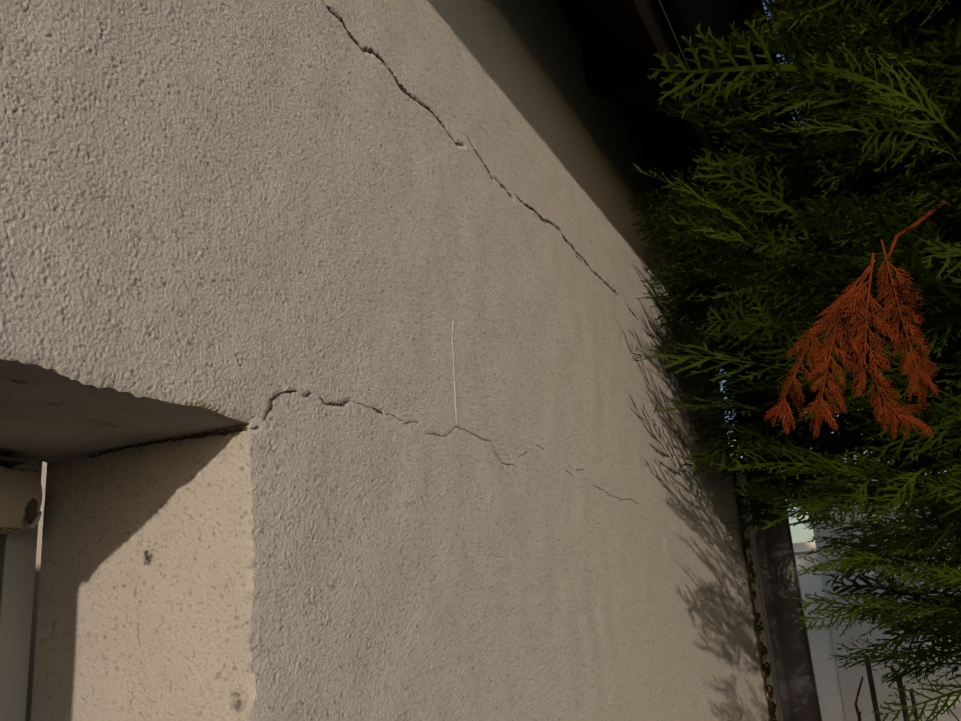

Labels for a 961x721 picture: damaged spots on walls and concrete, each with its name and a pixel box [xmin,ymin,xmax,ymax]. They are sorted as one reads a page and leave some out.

crack [322,0,638,320]
crack [87,321,544,467]
crack [566,468,639,505]